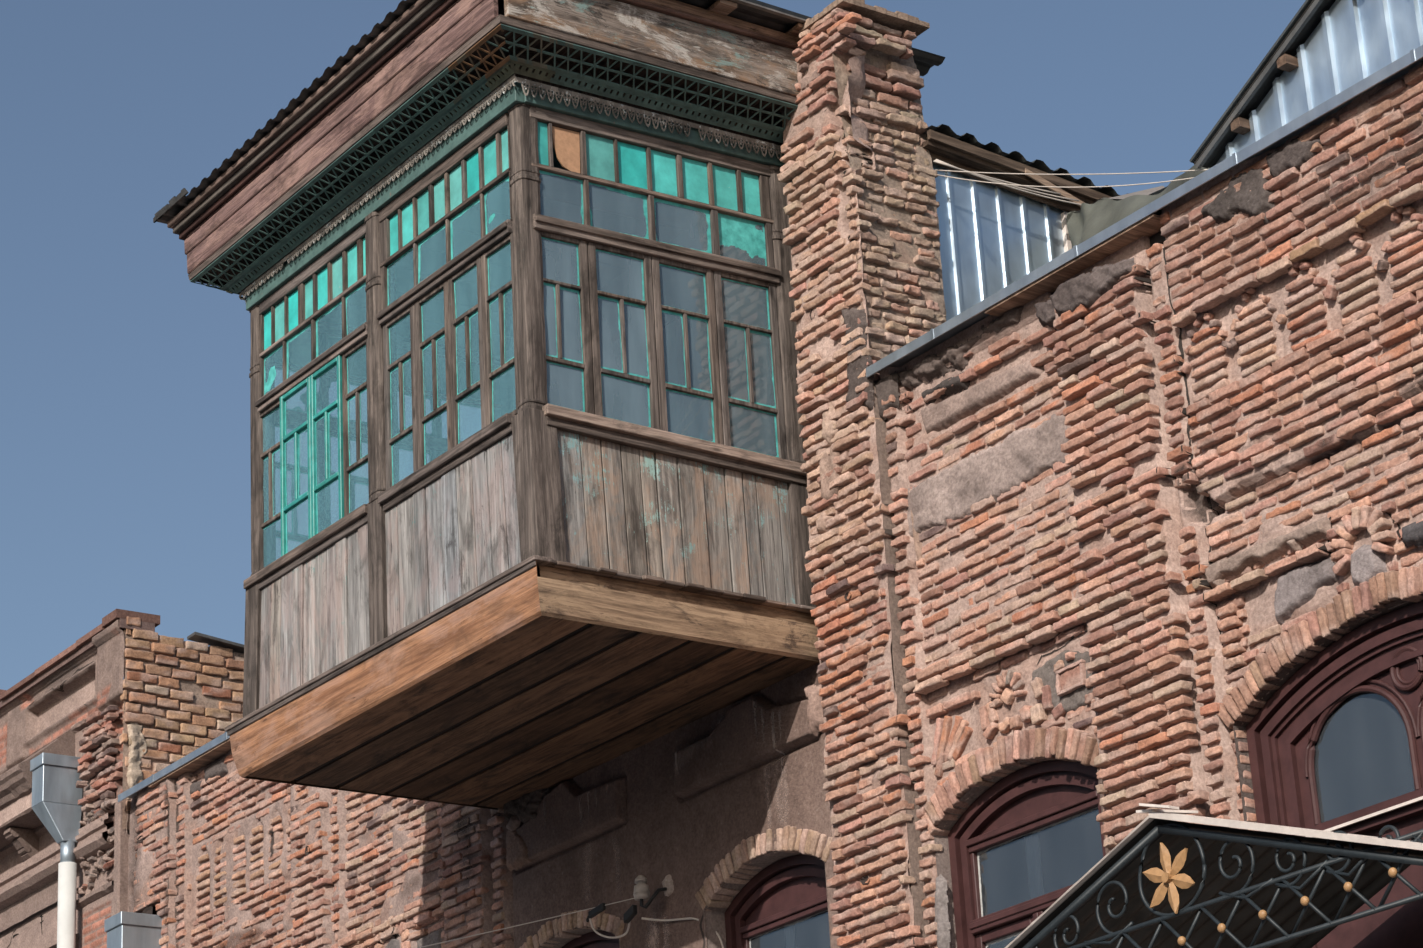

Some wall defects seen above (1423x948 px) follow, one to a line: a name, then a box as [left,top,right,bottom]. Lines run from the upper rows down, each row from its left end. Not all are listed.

crack [1133,248,1223,645]